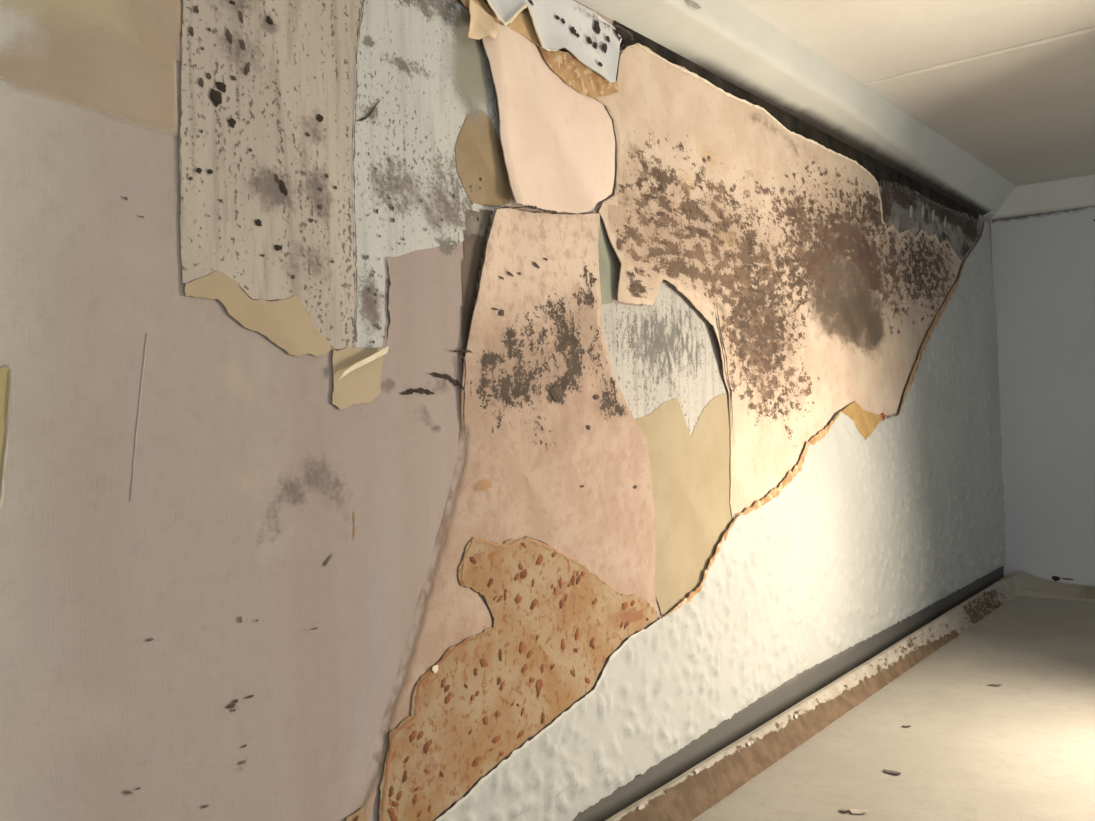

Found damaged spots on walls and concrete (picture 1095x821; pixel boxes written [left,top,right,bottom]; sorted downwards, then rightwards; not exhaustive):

water stain [0,0,194,127]
water stain [199,28,250,107]
peeling [0,365,11,510]
water stain [251,170,292,206]
flaking render [179,0,511,410]
water stain [364,178,493,367]
water stain [470,262,628,450]
peeling [598,224,734,615]
water stain [556,15,1095,448]
flaking render [880,182,982,262]
corrosion [346,536,659,821]
peeling [620,589,1007,821]